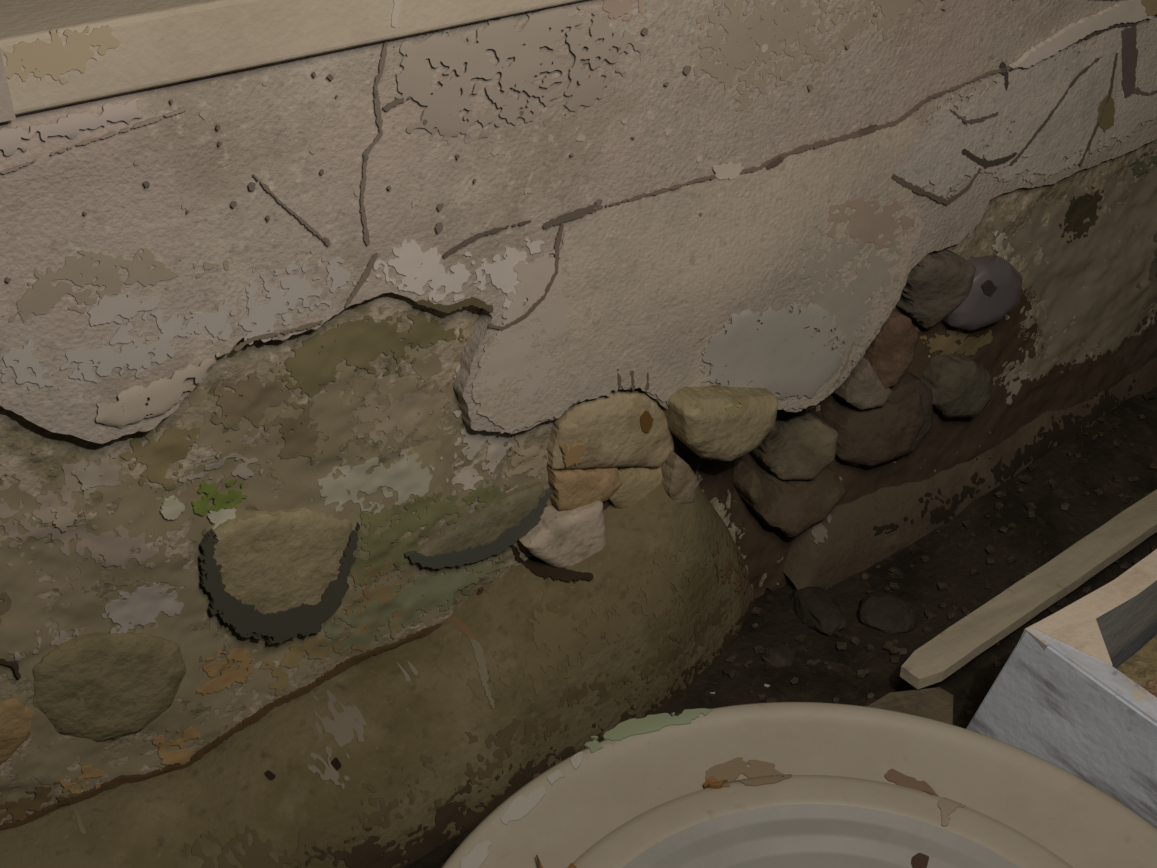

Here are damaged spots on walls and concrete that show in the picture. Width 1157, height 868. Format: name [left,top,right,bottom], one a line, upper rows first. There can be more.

crack [234,40,411,351]
crack [425,18,494,34]
crack [416,21,1157,331]
damp [1059,186,1104,243]
spalling [0,311,554,821]
spalling [673,434,794,599]